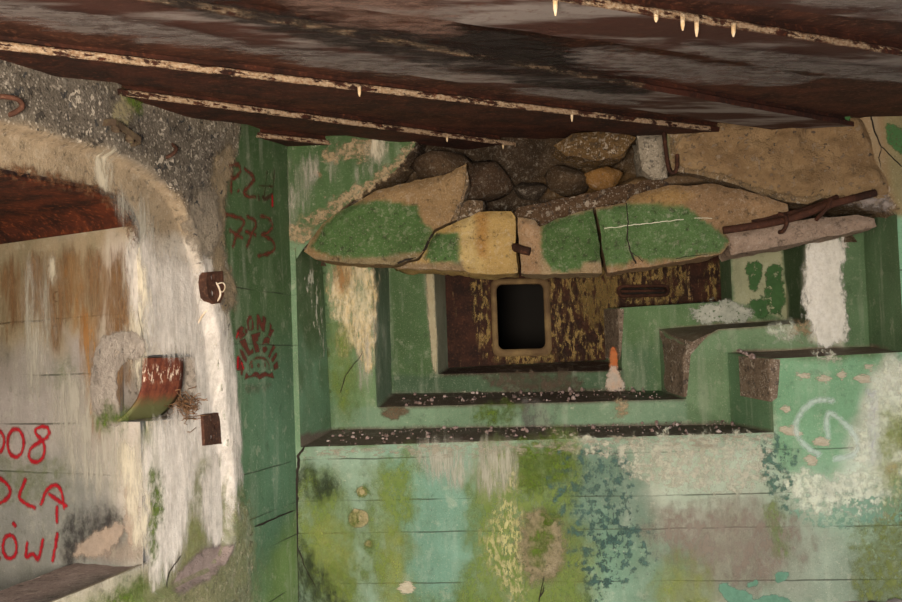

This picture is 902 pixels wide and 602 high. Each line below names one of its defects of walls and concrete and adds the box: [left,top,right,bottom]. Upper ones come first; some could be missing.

damp [0,0,902,131]
corrosion [1,163,140,241]
damp [95,149,114,191]
crack [397,234,433,264]
crack [626,203,643,264]
damp [25,258,55,387]
corrosion [2,251,134,427]
damp [55,204,242,593]
damp [299,469,333,501]
damp [298,550,336,602]